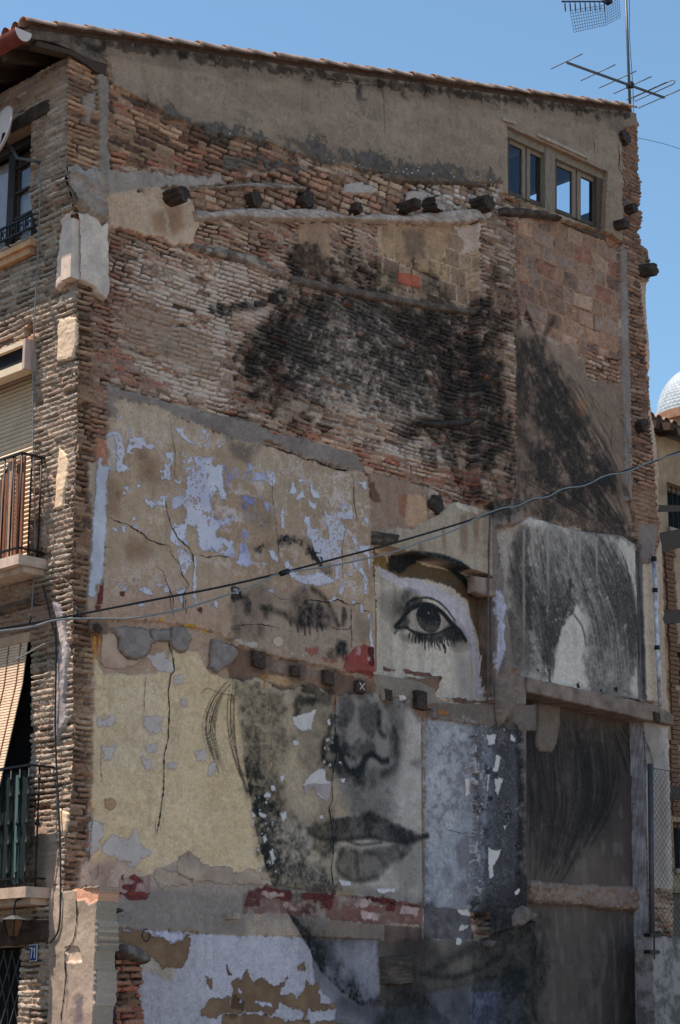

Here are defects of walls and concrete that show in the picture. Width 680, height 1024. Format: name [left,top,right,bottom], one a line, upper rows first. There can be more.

water stain [70,35,361,96]
water stain [377,79,630,120]
peeling [87,415,442,680]
crack [108,417,226,843]
peeling [292,709,316,746]
peeling [303,719,345,801]
peeling [486,728,516,795]
peeling [119,774,423,926]
peeling [488,847,501,879]
peeling [118,929,191,969]
peeling [456,909,471,945]
peeling [201,962,342,1024]